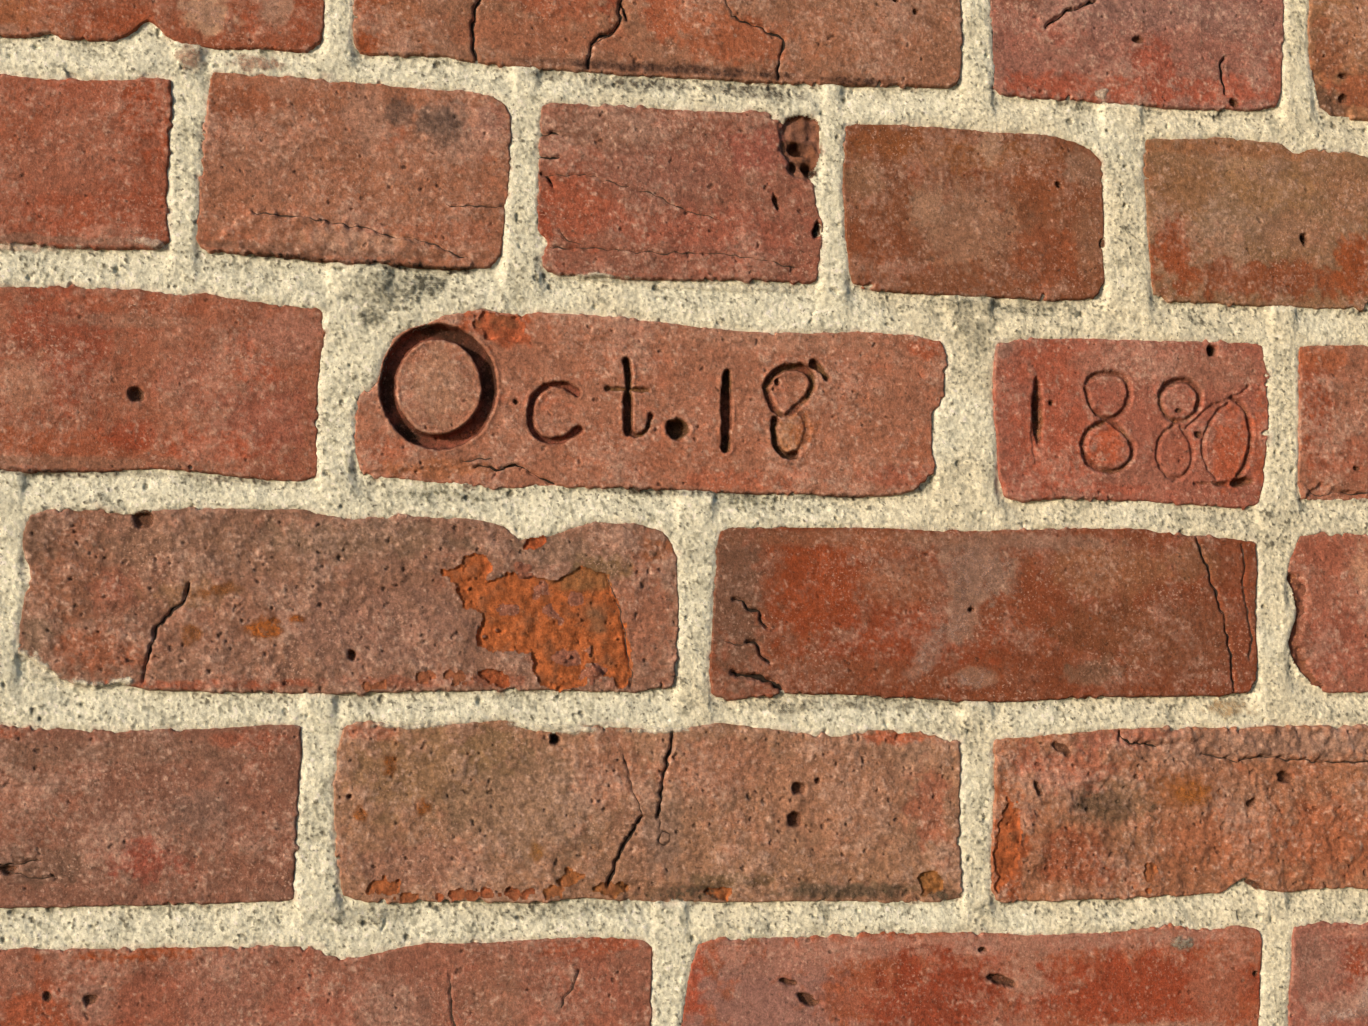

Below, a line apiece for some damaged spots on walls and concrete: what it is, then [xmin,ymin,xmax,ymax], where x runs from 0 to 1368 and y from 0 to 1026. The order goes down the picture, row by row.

crack [587,0,627,69]
crack [725,0,785,80]
crack [143,583,190,682]
spalling [416,535,633,693]
crack [725,599,782,691]
crack [1196,538,1253,688]
crack [607,734,673,886]